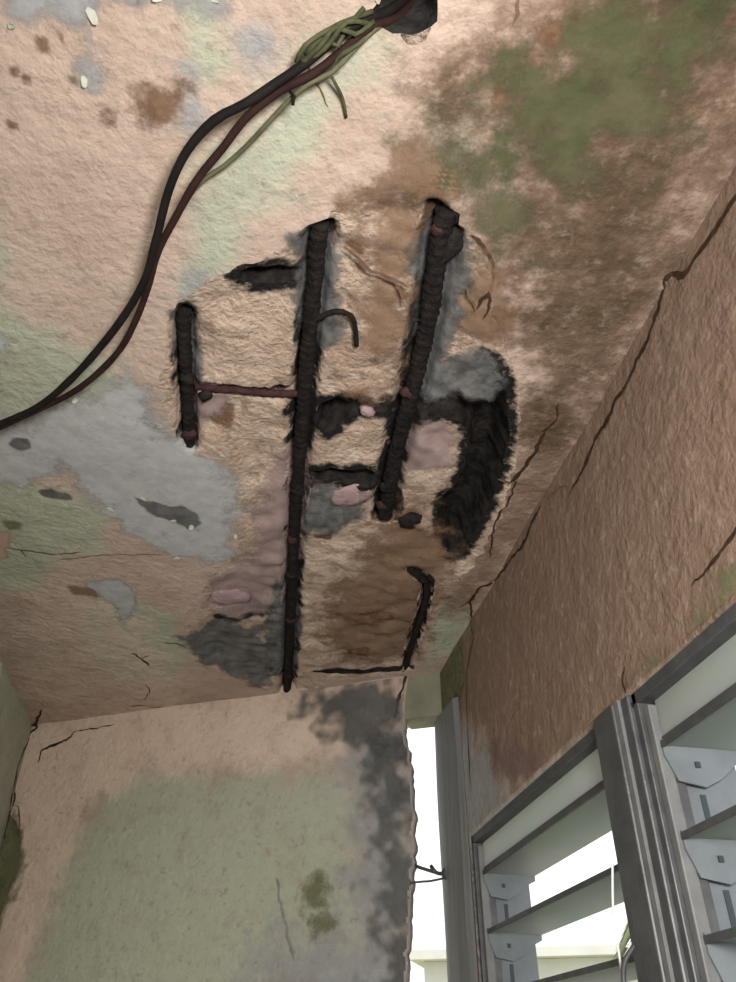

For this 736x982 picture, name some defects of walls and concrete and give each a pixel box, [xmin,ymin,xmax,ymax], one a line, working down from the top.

peeling [5,0,99,29]
water stain [434,0,731,257]
water stain [317,228,348,349]
corrosion [337,137,459,368]
water stain [420,235,504,404]
spalling [0,187,521,694]
corrosion [203,441,325,619]
corrosion [322,502,456,664]
corrosion [406,421,455,470]
crack [460,194,736,785]
crack [1,709,114,848]
water stain [299,681,412,982]